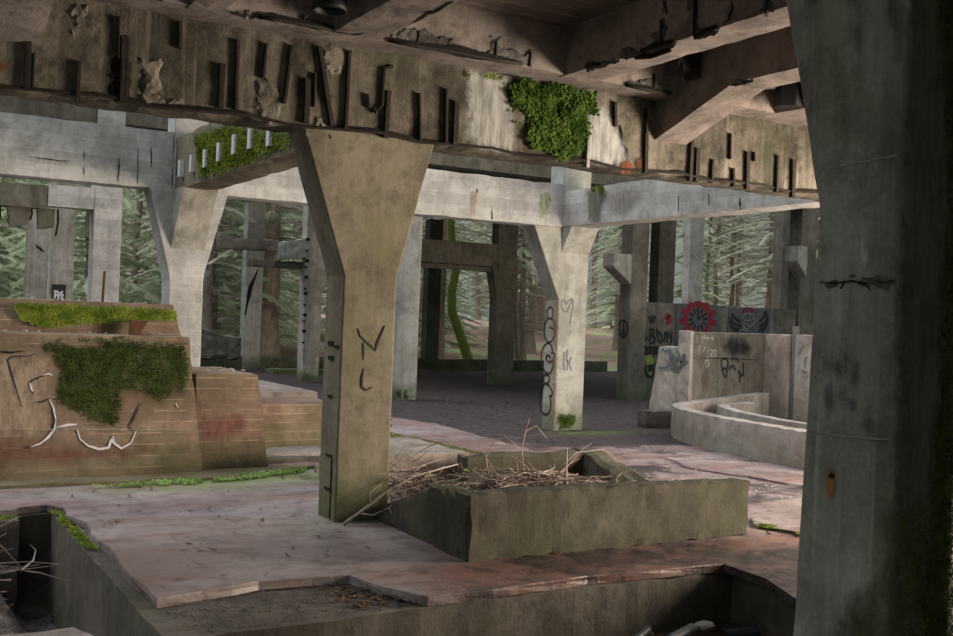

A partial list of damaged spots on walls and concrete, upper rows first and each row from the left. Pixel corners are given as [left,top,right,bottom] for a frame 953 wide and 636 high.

spalling [237,9,346,75]
spalling [388,28,534,68]
spalling [584,0,676,72]
spalling [687,0,720,40]
spalling [759,0,775,13]
spalling [0,35,818,194]
crack [820,280,895,290]